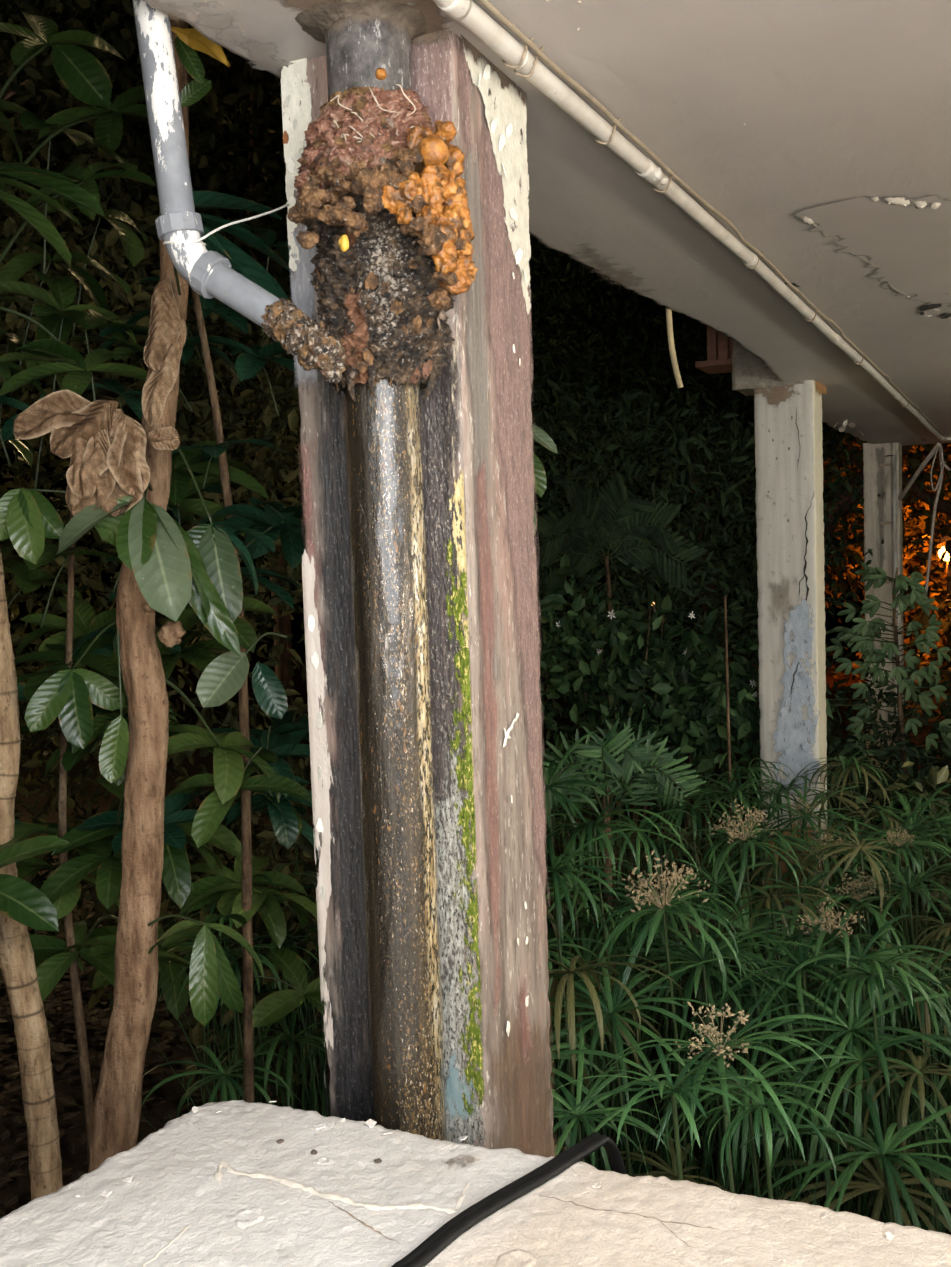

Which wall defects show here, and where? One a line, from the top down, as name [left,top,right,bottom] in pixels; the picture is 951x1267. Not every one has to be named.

damp [390,0,526,103]
peeling [794,195,951,319]
peeling [411,36,546,884]
crack [793,407,801,462]
crack [799,495,814,601]
damp [420,153,500,1147]
crack [142,1223,192,1267]
crack [214,1159,470,1243]